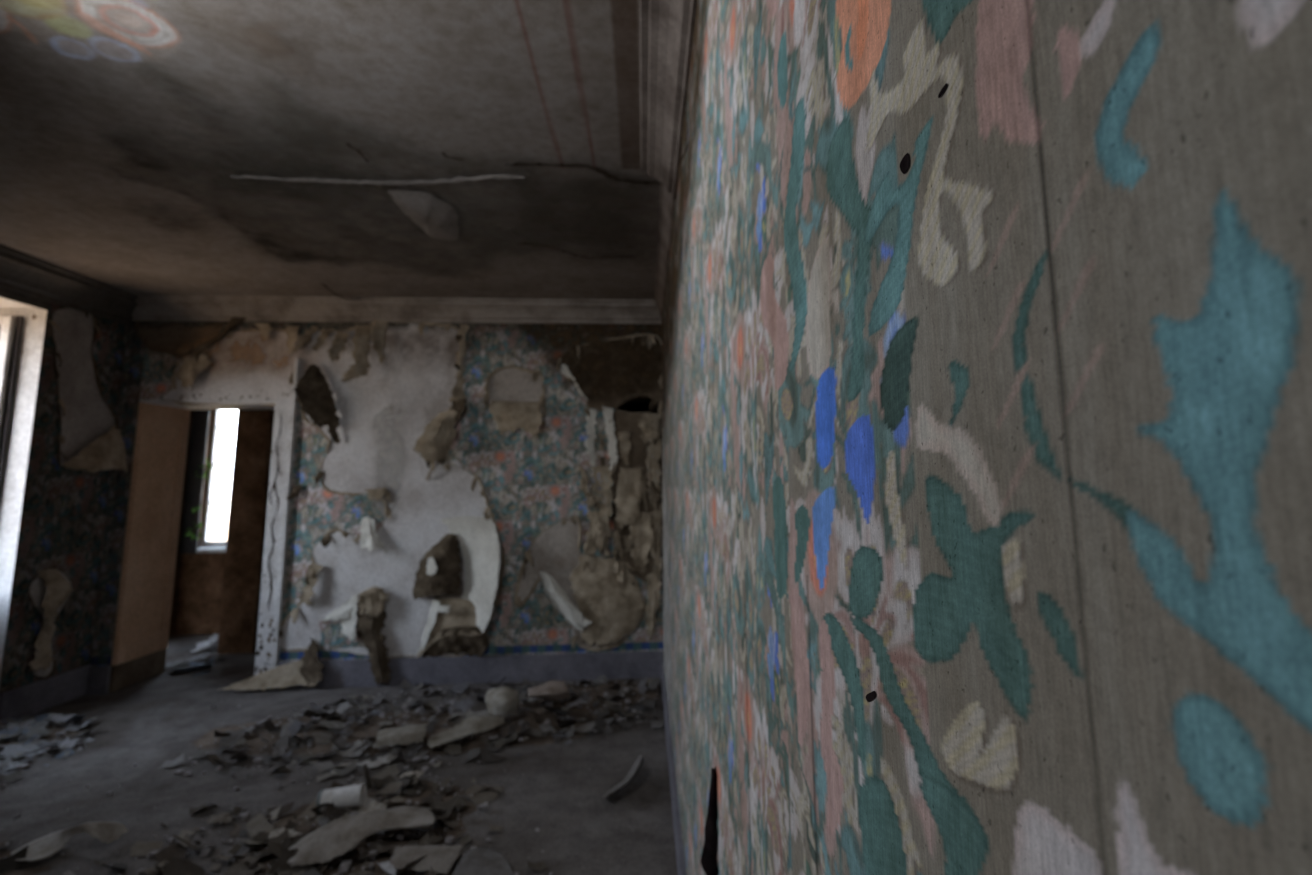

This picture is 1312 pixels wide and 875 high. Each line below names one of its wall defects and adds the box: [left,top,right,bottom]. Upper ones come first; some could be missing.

peeling [32,305,128,473]
peeling [160,316,505,675]
peeling [540,571,592,633]
peeling [483,334,663,585]